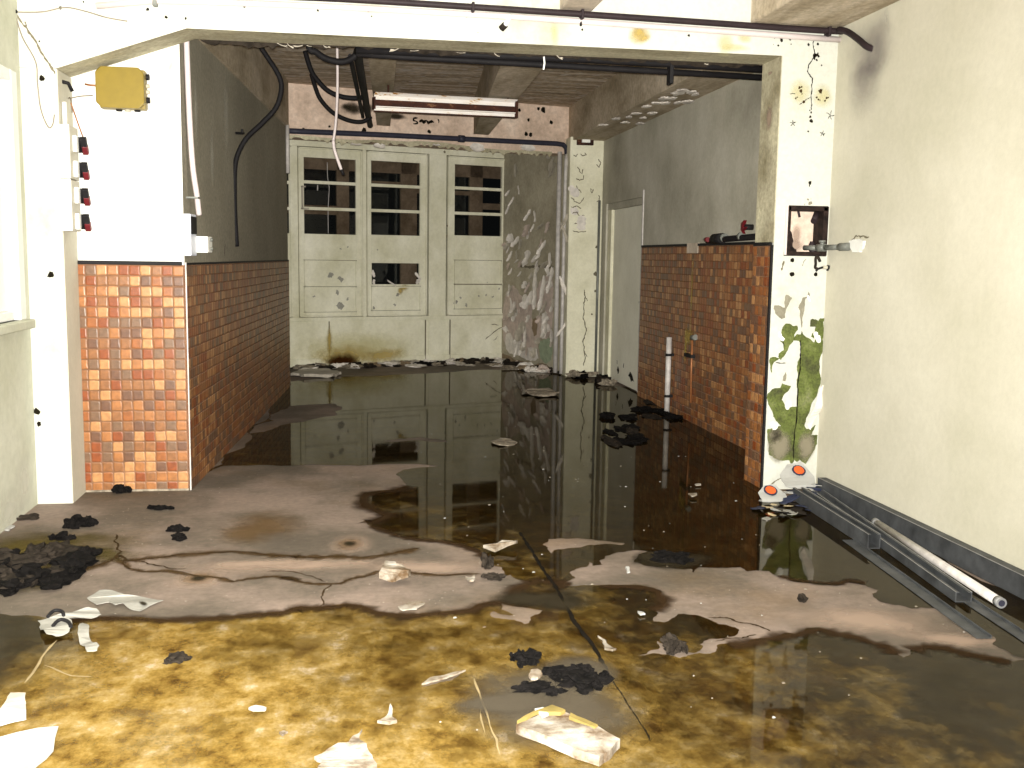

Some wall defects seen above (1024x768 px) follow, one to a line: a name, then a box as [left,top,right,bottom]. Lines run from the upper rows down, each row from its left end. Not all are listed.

leakage [633,29,647,40]
leakage [598,88,699,126]
crack [790,42,835,136]
peeling [478,209,566,368]
rust [328,333,394,364]
crack [771,340,801,484]
peeling [767,292,824,464]
crack [86,534,478,606]